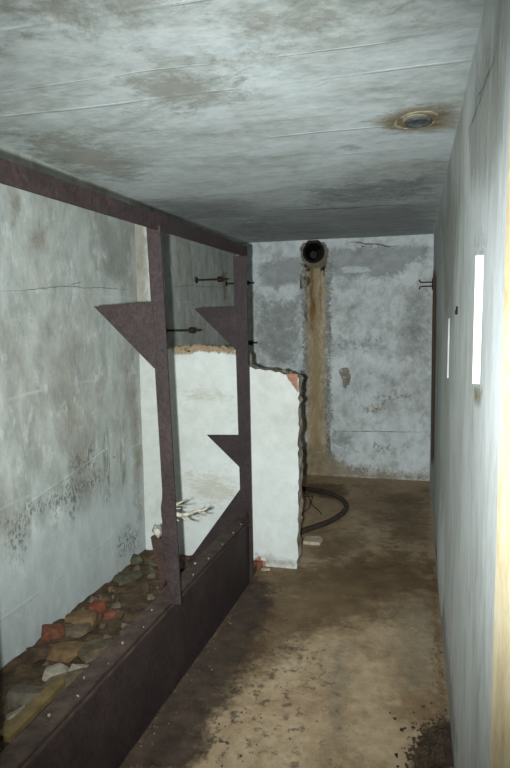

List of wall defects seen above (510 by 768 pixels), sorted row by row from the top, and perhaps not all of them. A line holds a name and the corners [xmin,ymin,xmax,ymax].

corrosion [378,105,456,131]
crack [16,282,117,291]
corrosion [300,242,334,475]
spalling [286,373,299,392]
damp [226,537,438,679]